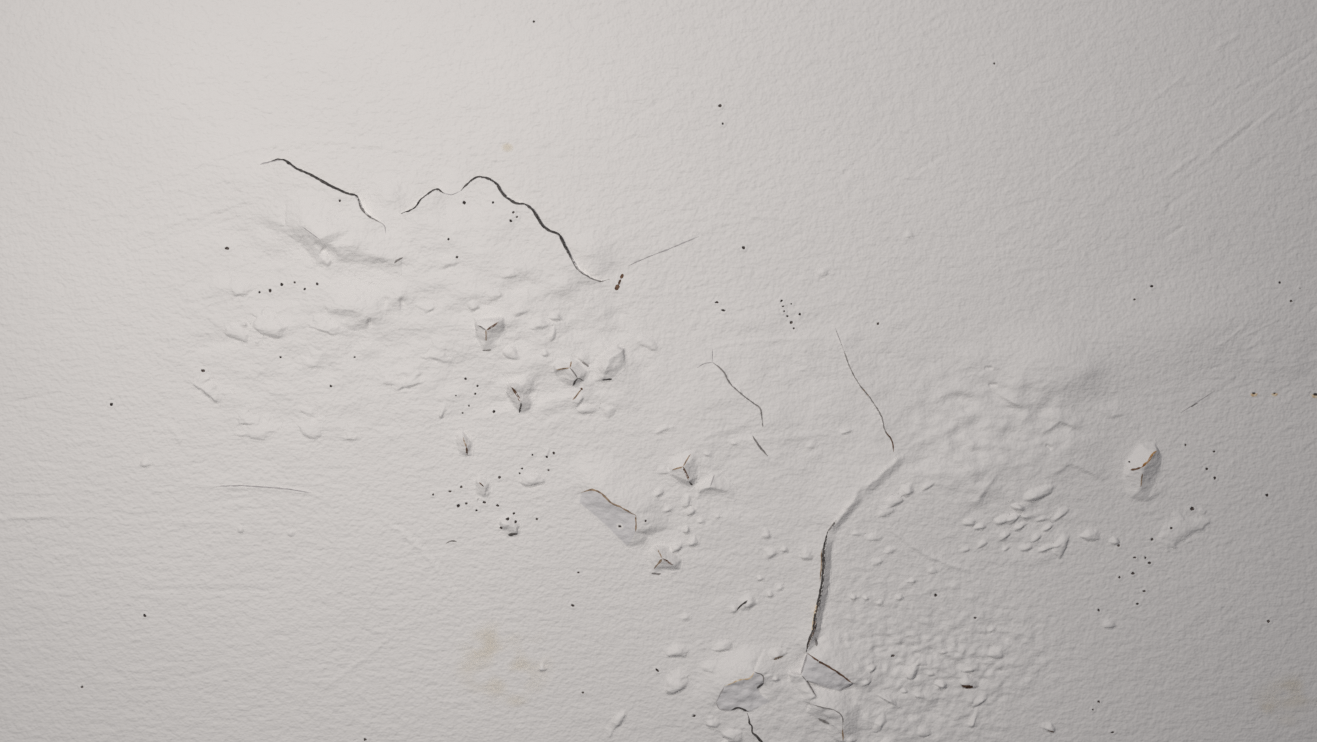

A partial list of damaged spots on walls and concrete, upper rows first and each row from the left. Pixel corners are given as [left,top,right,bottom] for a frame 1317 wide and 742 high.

crack [261,157,704,290]
crack [697,350,768,456]
crack [835,328,894,452]
peeling [1120,440,1164,501]
spalling [577,488,684,577]
crack [798,522,837,658]
spalling [714,670,773,714]
crack [742,712,768,742]
spalling [788,652,855,742]